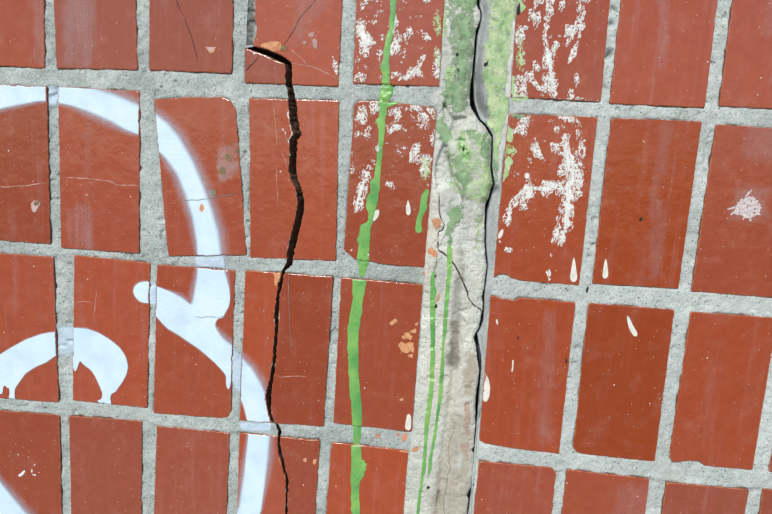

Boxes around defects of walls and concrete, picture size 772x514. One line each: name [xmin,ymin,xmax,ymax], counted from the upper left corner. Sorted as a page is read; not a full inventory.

crack [246,0,338,514]
crack [443,423,454,514]
crack [435,0,495,461]
crack [465,481,473,514]